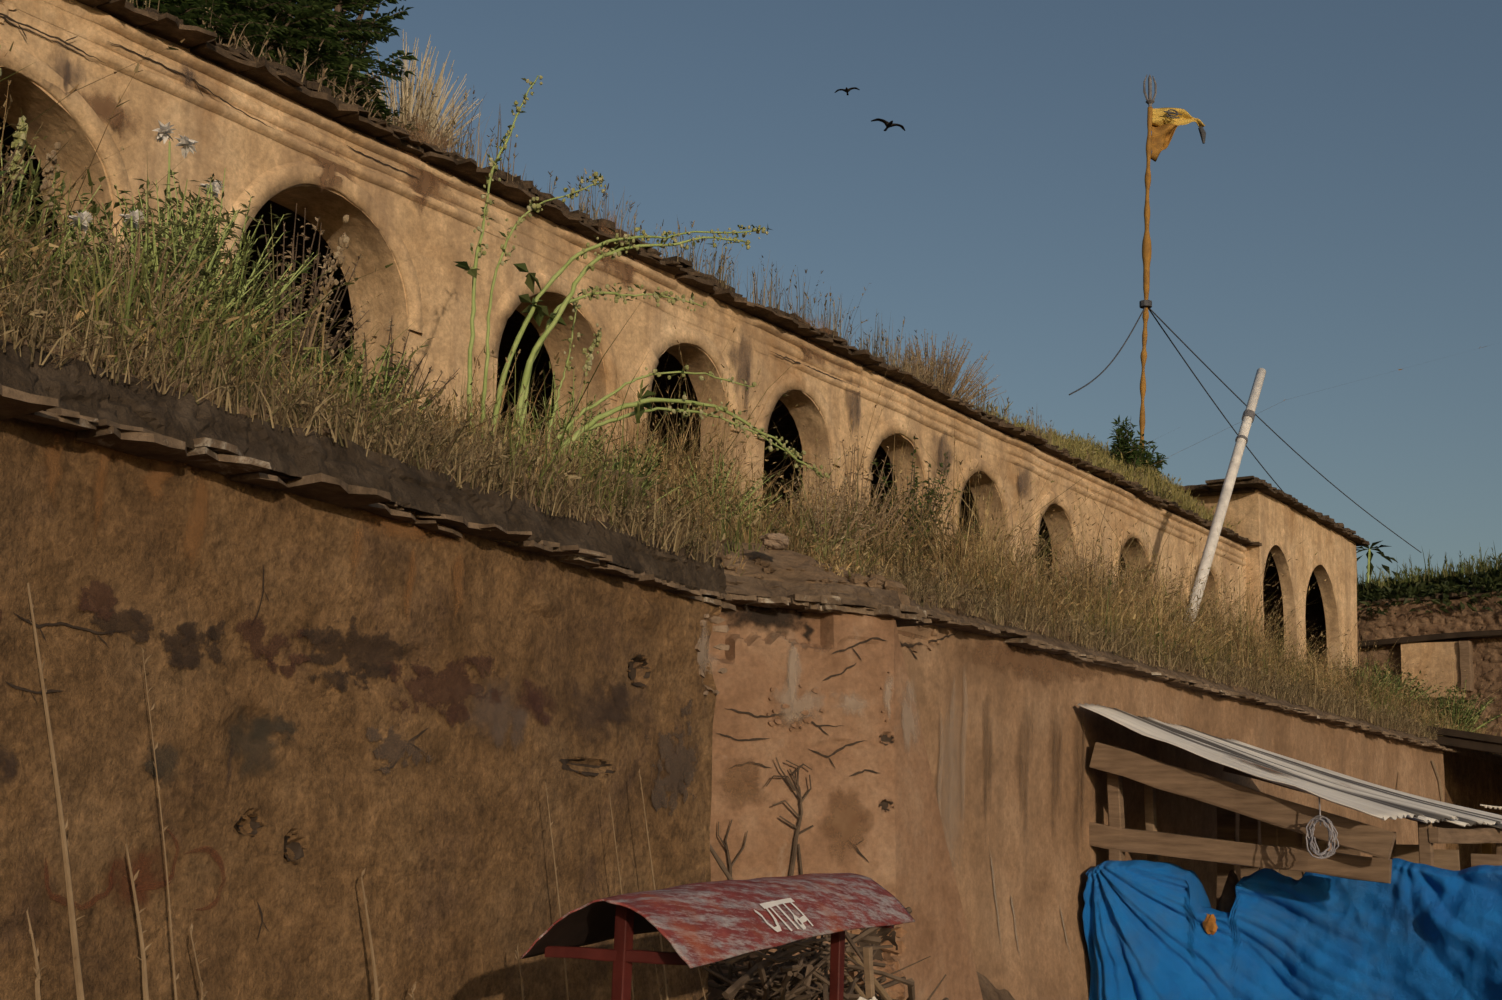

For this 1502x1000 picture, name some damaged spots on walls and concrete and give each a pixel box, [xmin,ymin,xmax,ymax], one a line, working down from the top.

spalling [695,604,814,695]
leakage [974,637,1095,683]
flaking render [879,671,896,746]
flaking render [234,814,267,836]
flaking render [283,831,308,864]
flaking render [879,799,895,812]